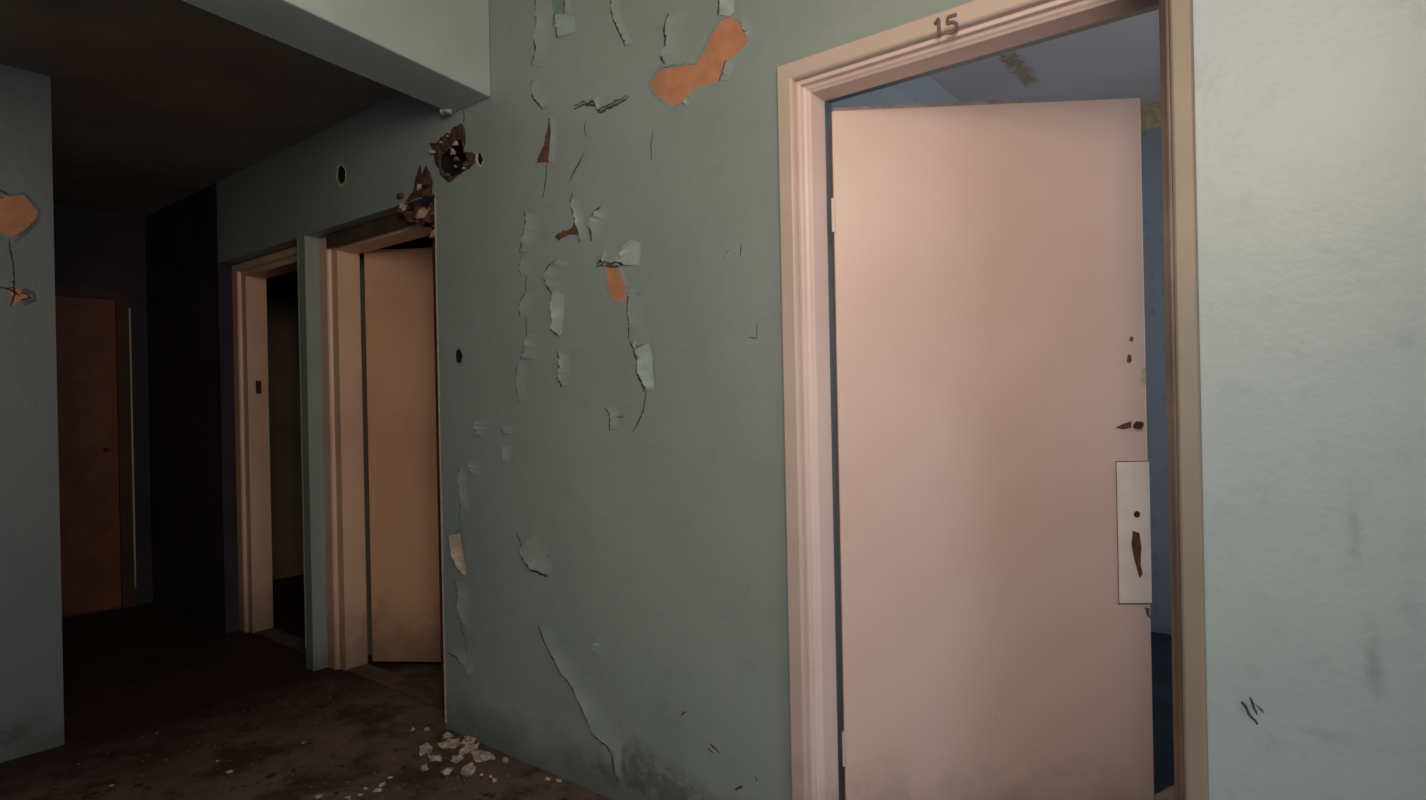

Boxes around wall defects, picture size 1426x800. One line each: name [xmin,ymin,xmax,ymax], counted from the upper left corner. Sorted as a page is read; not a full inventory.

spalling [429,109,483,182]
peeling [530,0,576,196]
peeling [574,89,629,114]
peeling [648,0,755,113]
crack [0,240,15,289]
peeling [0,190,41,243]
peeling [543,261,571,387]
peeling [552,195,656,431]
peeling [434,198,476,723]
peeling [538,625,625,785]